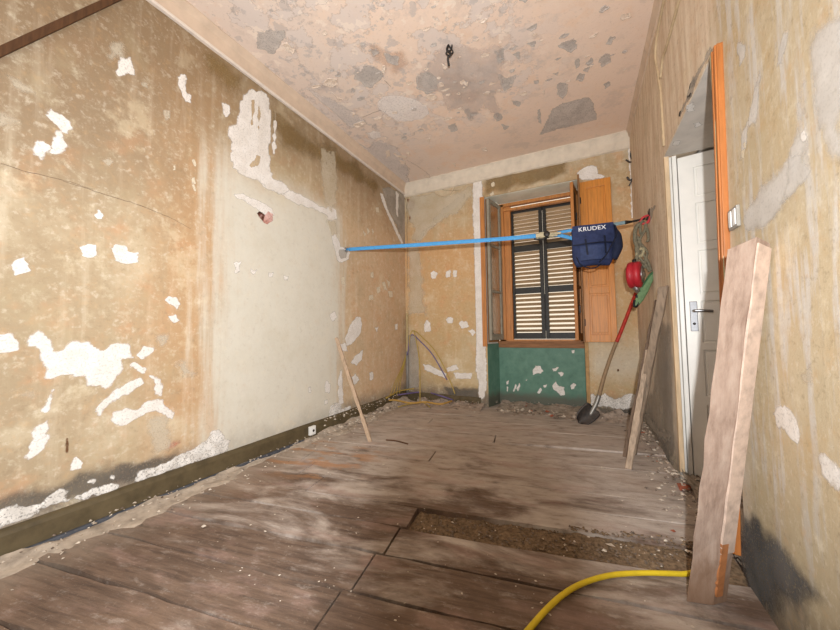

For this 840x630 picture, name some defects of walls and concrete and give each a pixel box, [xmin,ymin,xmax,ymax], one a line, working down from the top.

peeling [257,30,285,54]
peeling [527,33,615,134]
peeling [50,130,67,154]
flaking render [222,89,289,194]
peeling [506,365,543,392]
peeling [537,367,576,396]
water stain [0,475,119,528]
water stain [740,517,812,610]